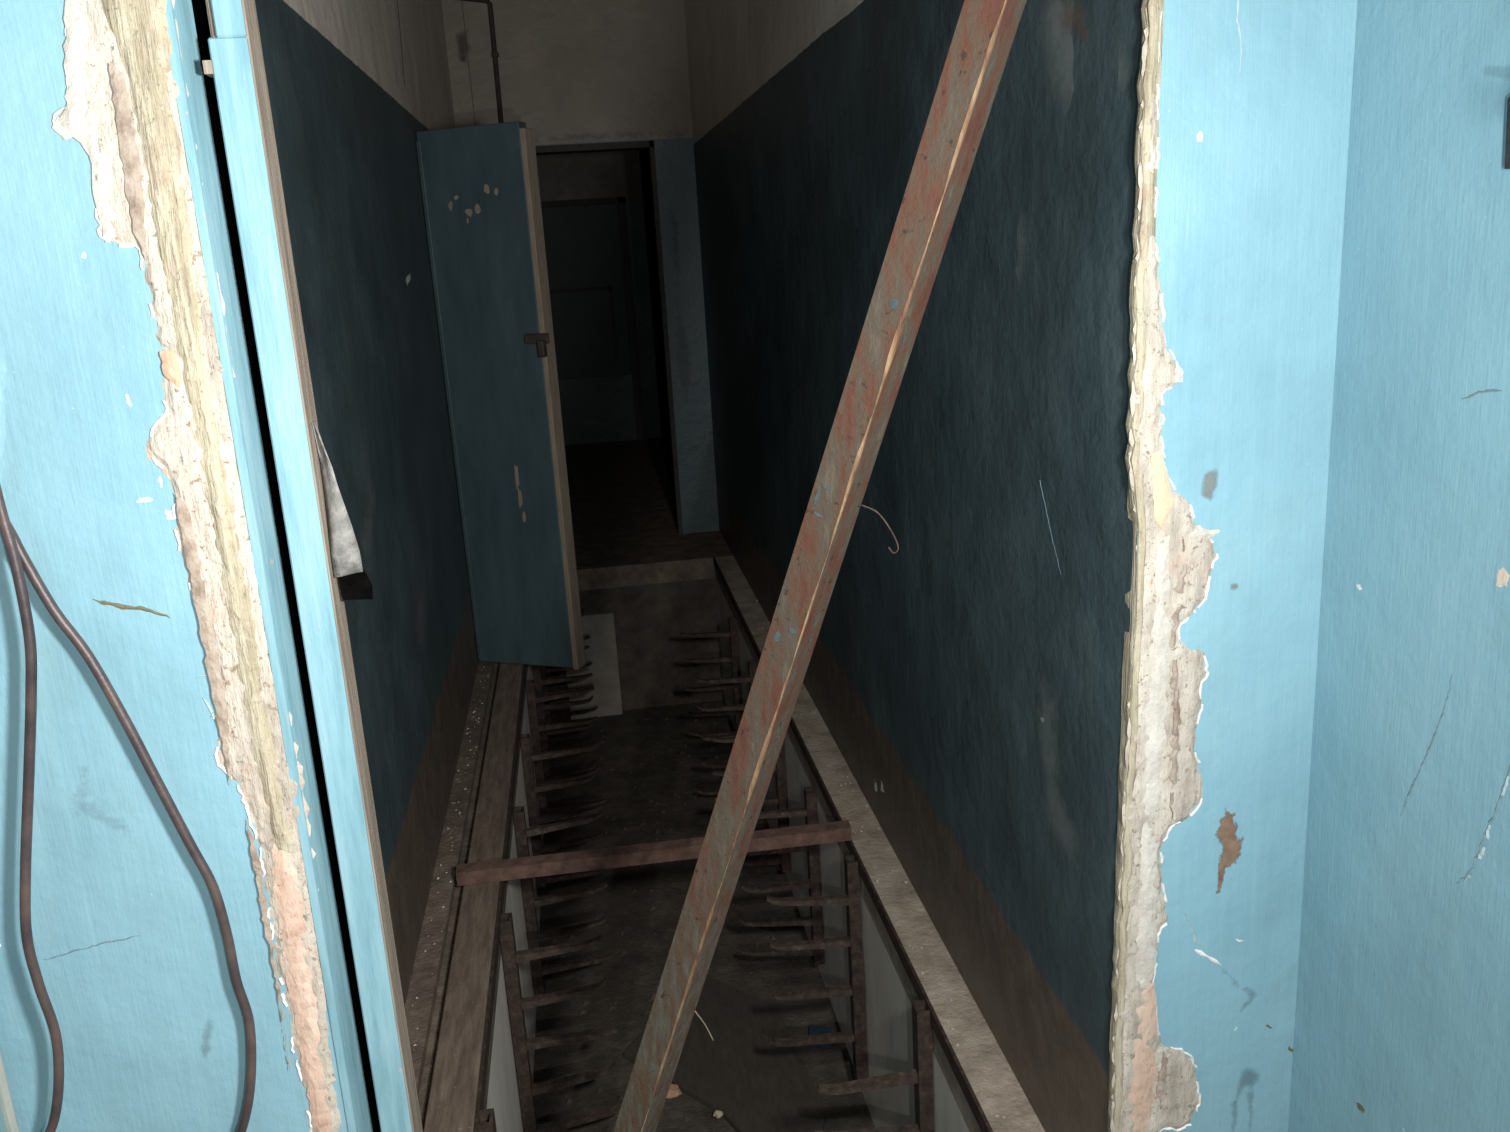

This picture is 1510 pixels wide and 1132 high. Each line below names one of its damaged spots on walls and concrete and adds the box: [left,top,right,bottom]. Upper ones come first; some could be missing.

spalling [52,0,342,1132]
spalling [1107,0,1220,1132]
rust [1216,811,1244,894]
crack [1457,765,1510,883]